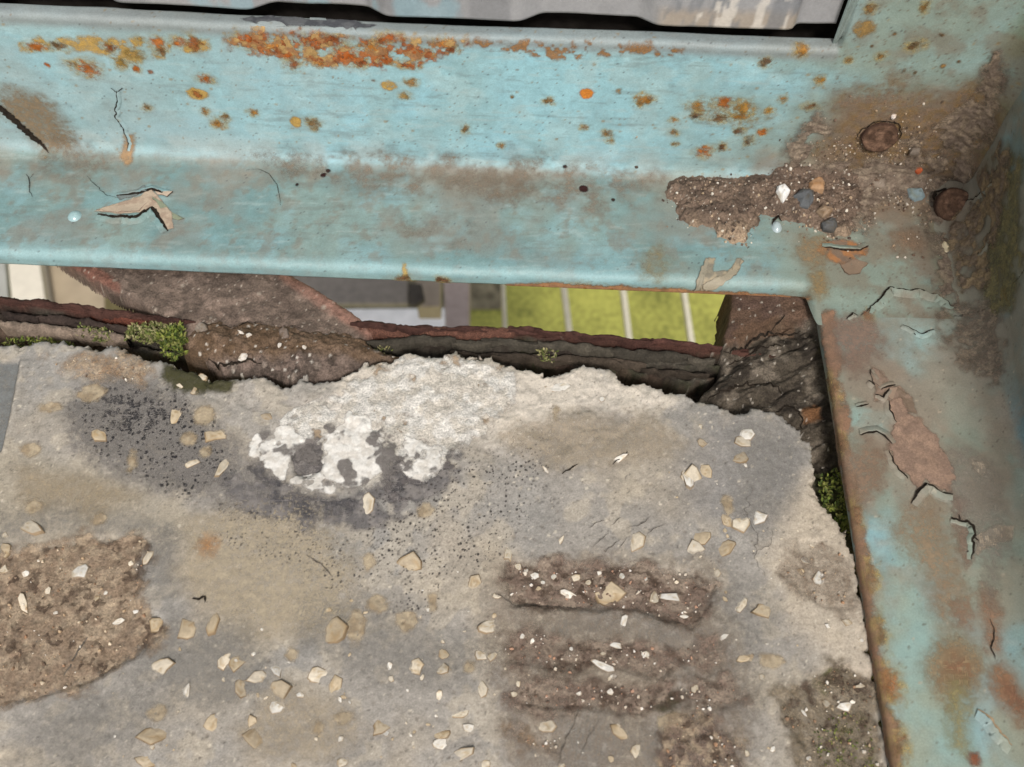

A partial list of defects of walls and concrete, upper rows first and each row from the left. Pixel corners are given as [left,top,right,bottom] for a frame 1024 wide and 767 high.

corrosion [19,36,209,76]
corrosion [224,26,682,99]
crack [111,88,134,165]
corrosion [186,76,228,128]
corrosion [290,117,318,131]
corrosion [692,98,773,144]
peeling [95,185,184,233]
peeling [693,258,744,292]
peeling [866,367,956,508]
leakage [70,377,677,701]
corrosion [821,310,911,767]
leakage [497,584,748,767]